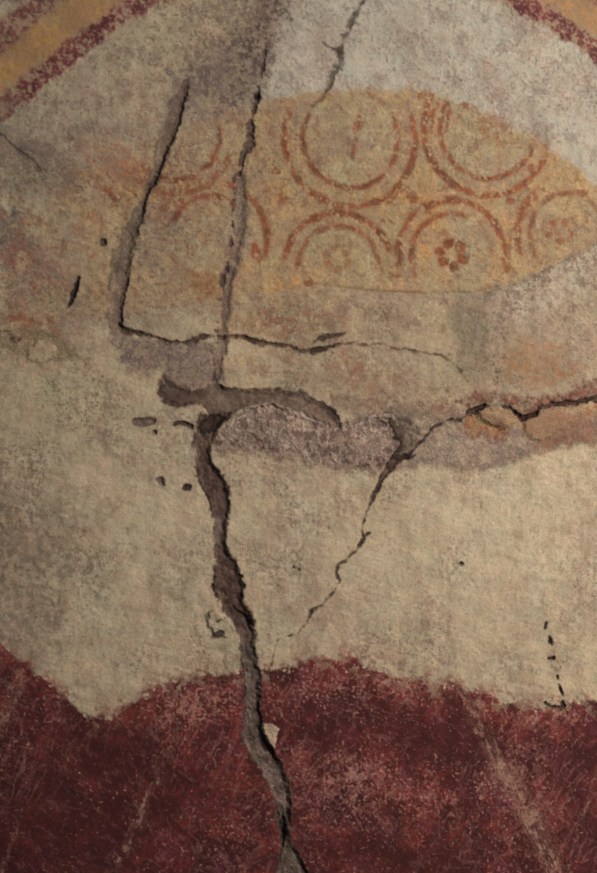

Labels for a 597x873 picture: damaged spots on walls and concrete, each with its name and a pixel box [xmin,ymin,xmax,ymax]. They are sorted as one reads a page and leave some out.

crack [312,1,364,106]
crack [107,49,597,873]